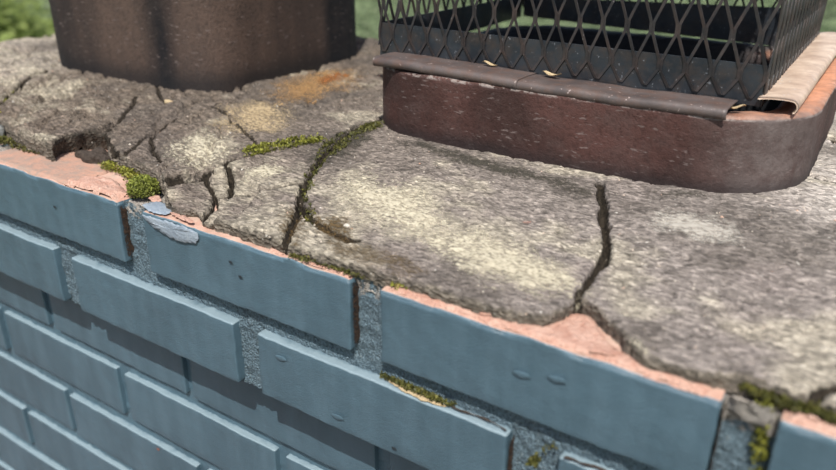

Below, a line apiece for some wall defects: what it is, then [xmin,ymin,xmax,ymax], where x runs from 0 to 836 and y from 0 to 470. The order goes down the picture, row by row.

crack [1,71,48,105]
spalling [0,147,129,200]
crack [104,86,258,223]
crack [282,119,382,254]
peeling [142,195,198,244]
spalling [268,248,348,276]
crack [573,184,612,314]
spalling [389,285,714,396]
peeling [388,380,446,407]
crack [452,406,506,431]
peeling [722,393,836,437]
crack [807,386,836,410]